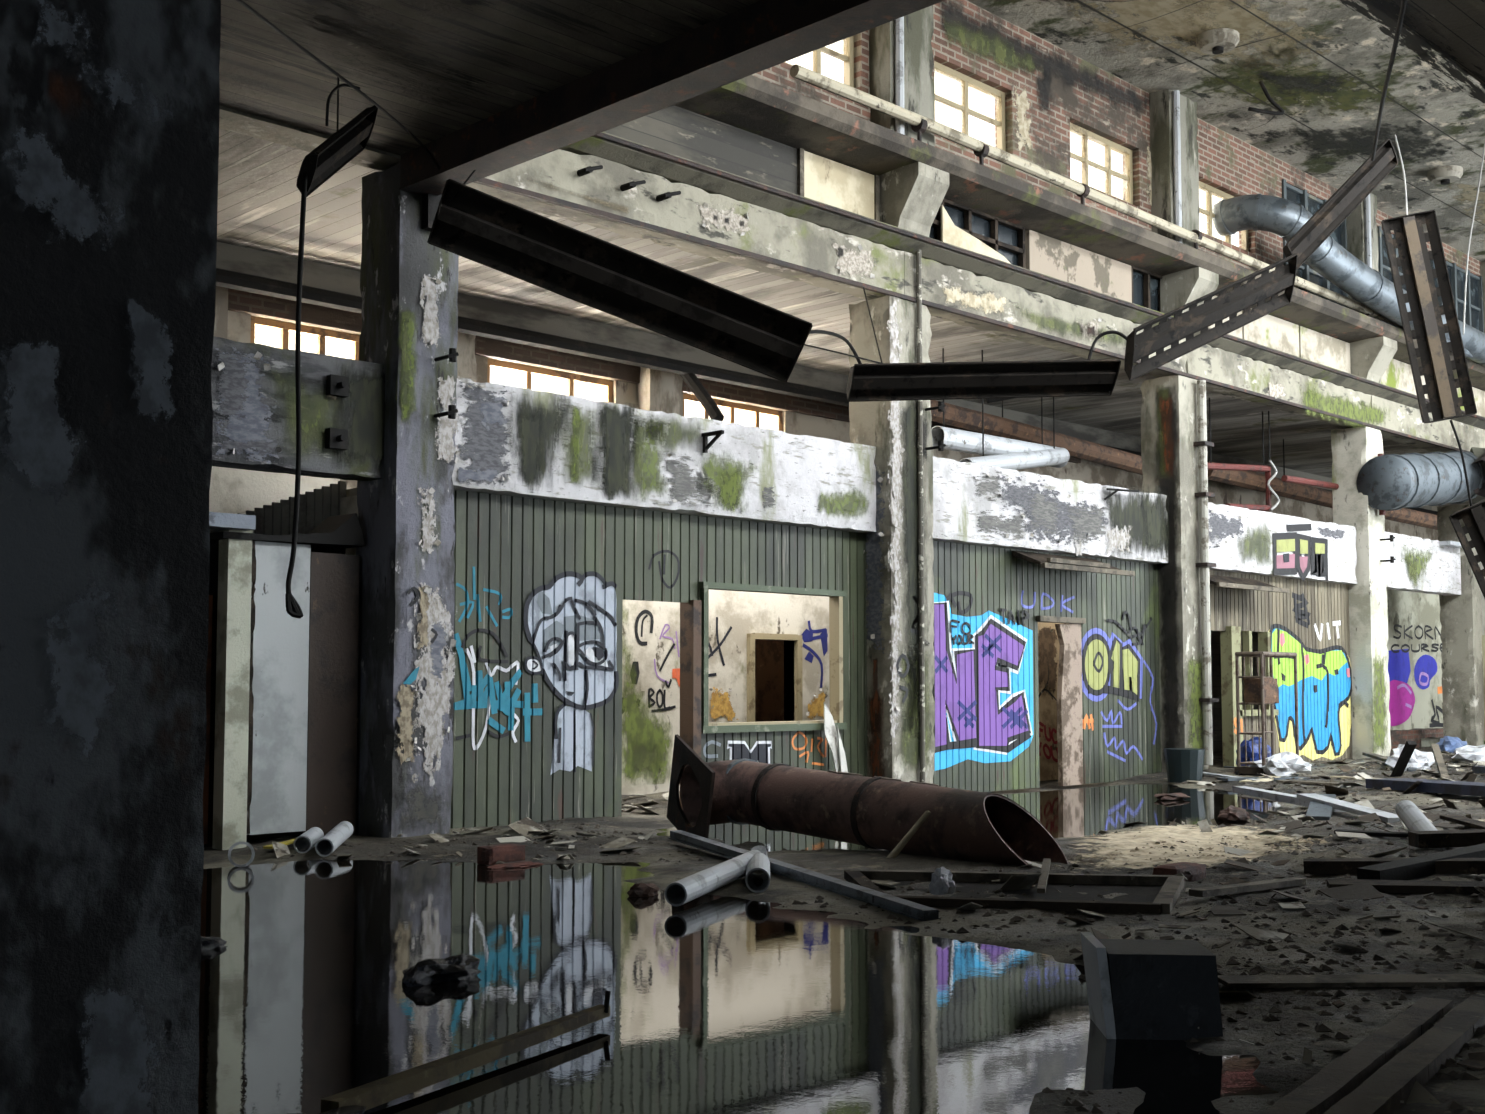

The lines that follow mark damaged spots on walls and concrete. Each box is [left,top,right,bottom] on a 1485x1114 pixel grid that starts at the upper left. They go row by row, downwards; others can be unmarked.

damp [1039,0,1332,78]
damp [1265,122,1473,164]
peeling [420,274,442,348]
damp [510,395,700,498]
peeling [417,487,441,554]
damp [720,471,739,510]
peeling [973,471,1110,550]
peeling [395,577,457,783]